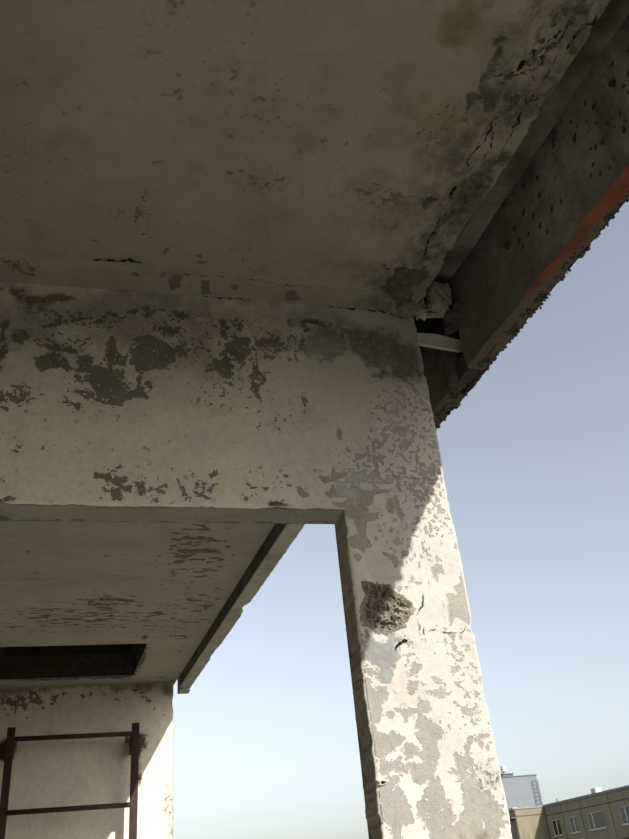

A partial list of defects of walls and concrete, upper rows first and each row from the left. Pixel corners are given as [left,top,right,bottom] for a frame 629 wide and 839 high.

damp [465,0,587,121]
crack [382,0,610,270]
crack [93,257,143,265]
damp [383,266,429,306]
peeling [0,306,308,437]
peeling [88,464,219,503]
peeling [242,466,310,502]
peeling [0,524,234,653]
peeling [318,362,509,839]
crack [395,583,472,651]
peeling [0,687,105,719]